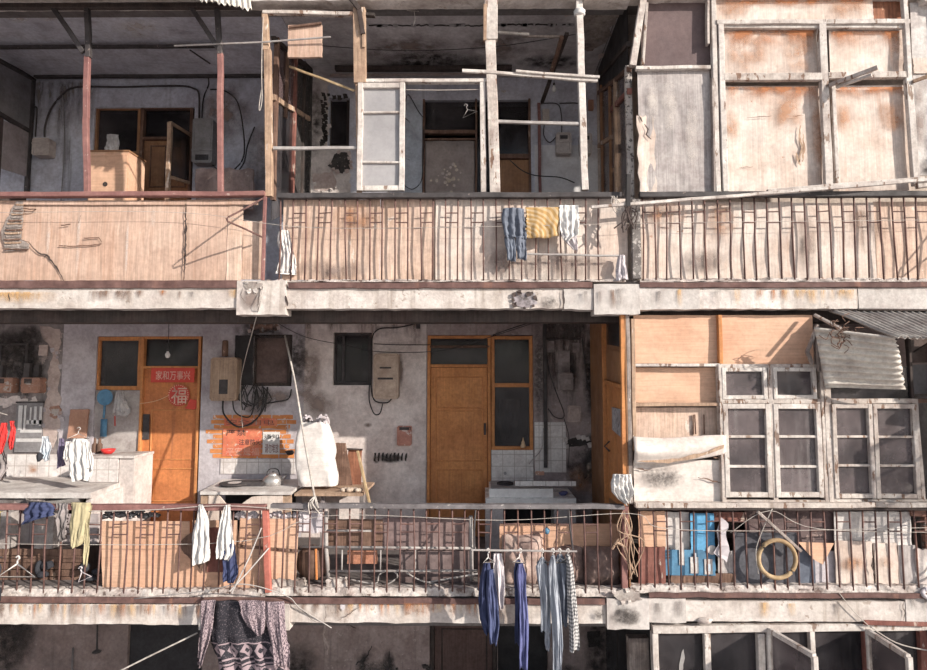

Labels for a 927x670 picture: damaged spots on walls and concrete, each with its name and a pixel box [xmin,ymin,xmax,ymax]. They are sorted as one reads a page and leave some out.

corrosion [732,30,814,40]
corrosion [833,31,900,49]
corrosion [749,86,814,122]
crack [22,240,64,281]
peeling [0,326,64,450]
damp [356,646,393,670]